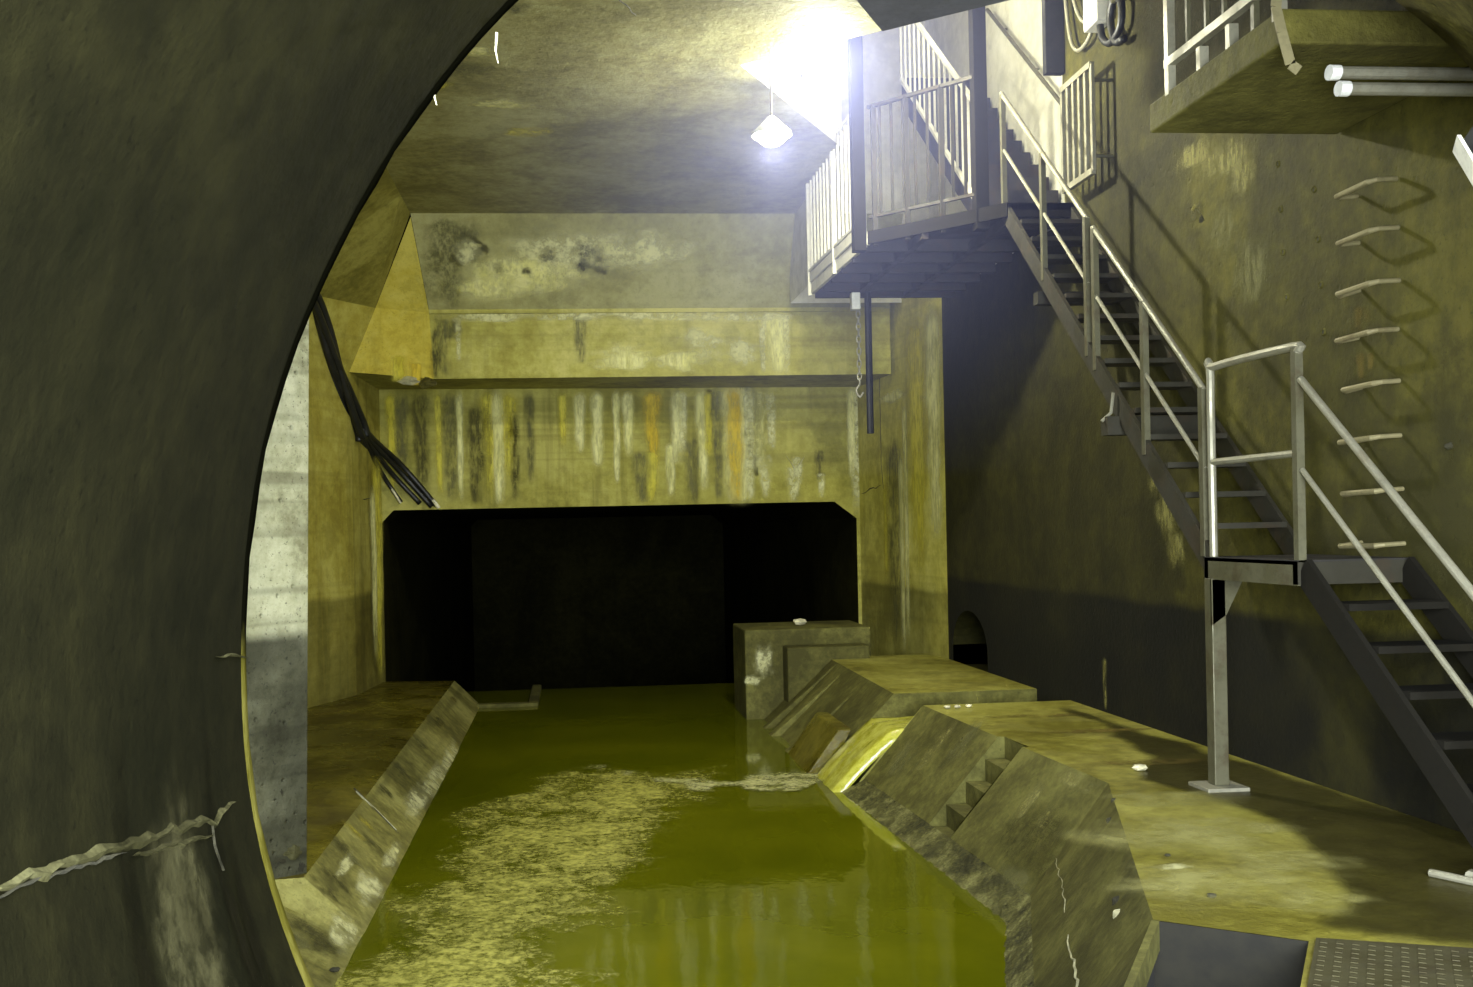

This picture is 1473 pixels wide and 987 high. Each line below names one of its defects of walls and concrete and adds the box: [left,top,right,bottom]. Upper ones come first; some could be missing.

water stain [430,222,688,376]
water stain [559,394,647,500]
corrosion [645,394,659,498]
water stain [666,388,775,500]
water stain [787,454,824,493]
water stain [848,391,859,496]
crack [0,801,235,899]